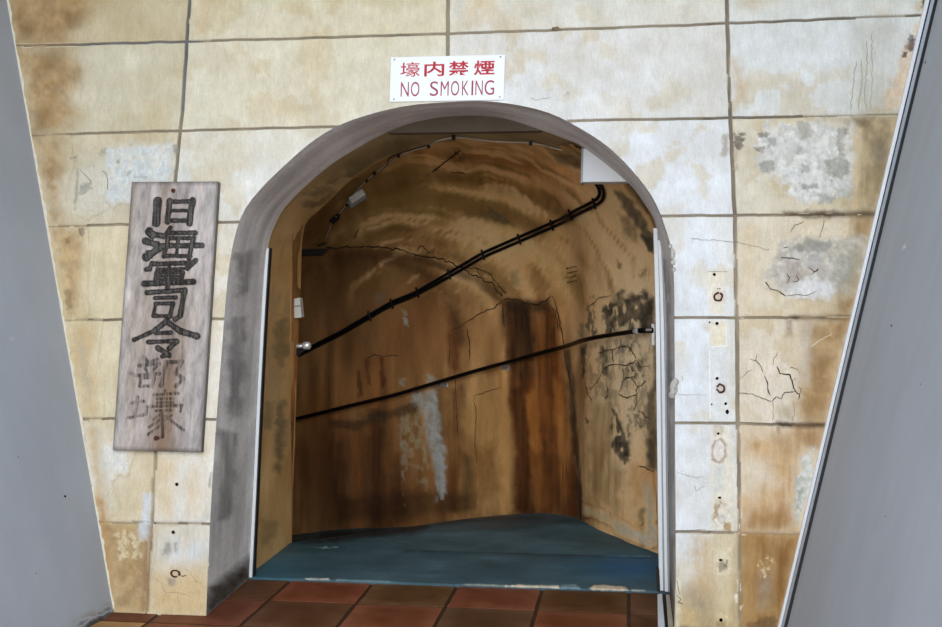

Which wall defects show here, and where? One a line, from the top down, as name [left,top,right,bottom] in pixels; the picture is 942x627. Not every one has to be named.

damp [188,0,226,43]
damp [544,144,581,172]
peeling [748,116,852,208]
damp [9,0,117,423]
damp [231,247,260,300]
crack [326,228,564,344]
peeling [762,221,854,303]
crack [586,345,652,420]
crack [737,352,801,418]
damp [262,397,291,477]
damp [327,369,557,527]
damp [257,515,281,549]